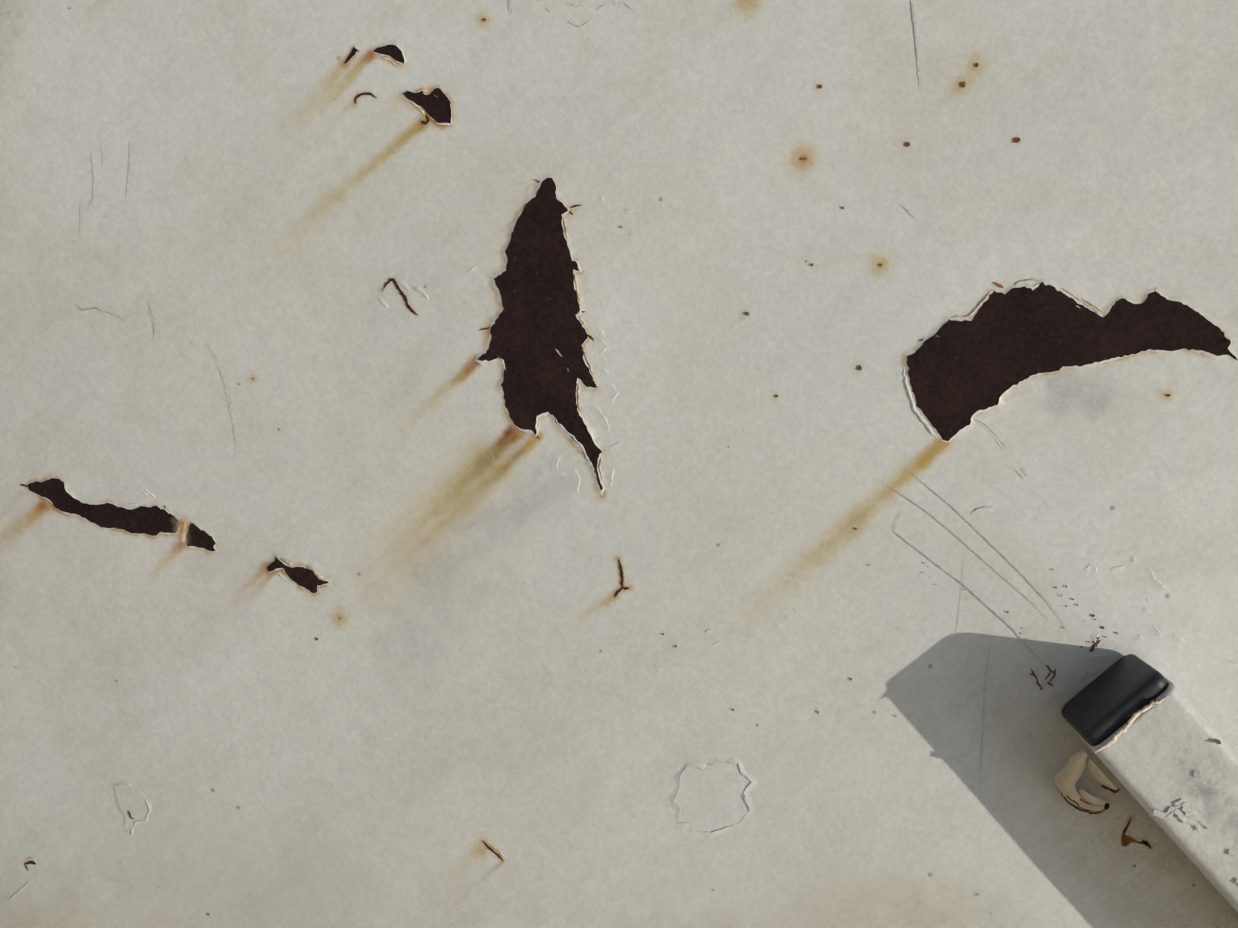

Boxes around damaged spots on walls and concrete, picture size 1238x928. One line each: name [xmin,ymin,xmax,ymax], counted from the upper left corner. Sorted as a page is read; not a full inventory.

peeling [342,42,408,67]
peeling [399,85,455,129]
corrosion [364,116,430,175]
peeling [474,172,610,499]
peeling [901,277,1238,445]
peeling [20,473,219,556]
corrosion [450,425,543,498]
corrosion [848,438,949,530]
peeling [263,554,332,596]